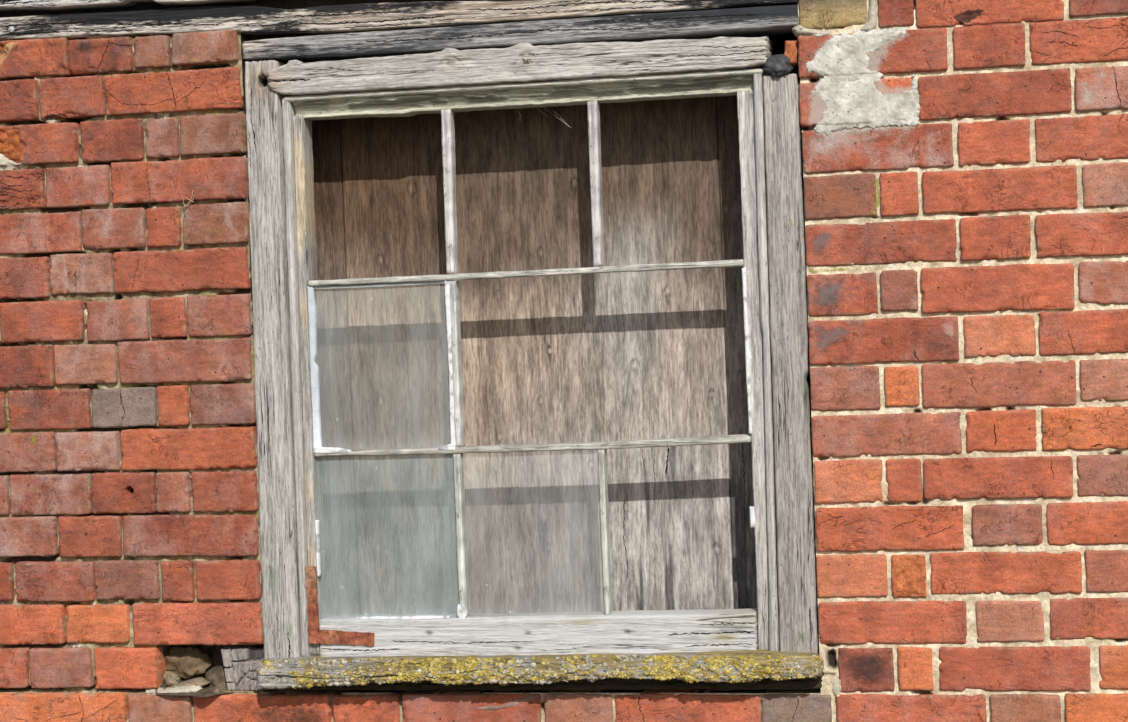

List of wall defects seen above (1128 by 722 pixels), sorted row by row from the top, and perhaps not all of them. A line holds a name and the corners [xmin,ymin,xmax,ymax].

spalling [0,127,25,162]